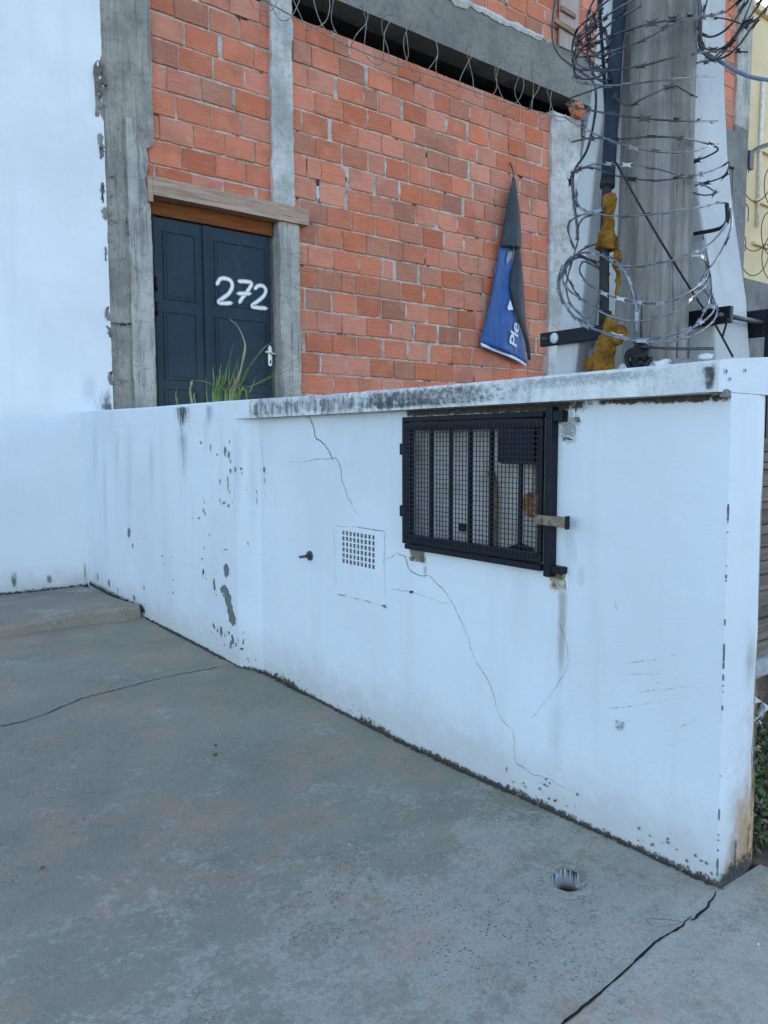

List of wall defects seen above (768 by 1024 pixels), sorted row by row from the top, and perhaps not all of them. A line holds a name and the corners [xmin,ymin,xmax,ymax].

damp [250,366,727,417]
peeling [199,432,243,508]
peeling [201,534,276,669]
crack [290,416,494,695]
rust [548,572,569,592]
crack [0,666,220,726]
damp [0,567,752,890]
crack [561,892,716,1024]